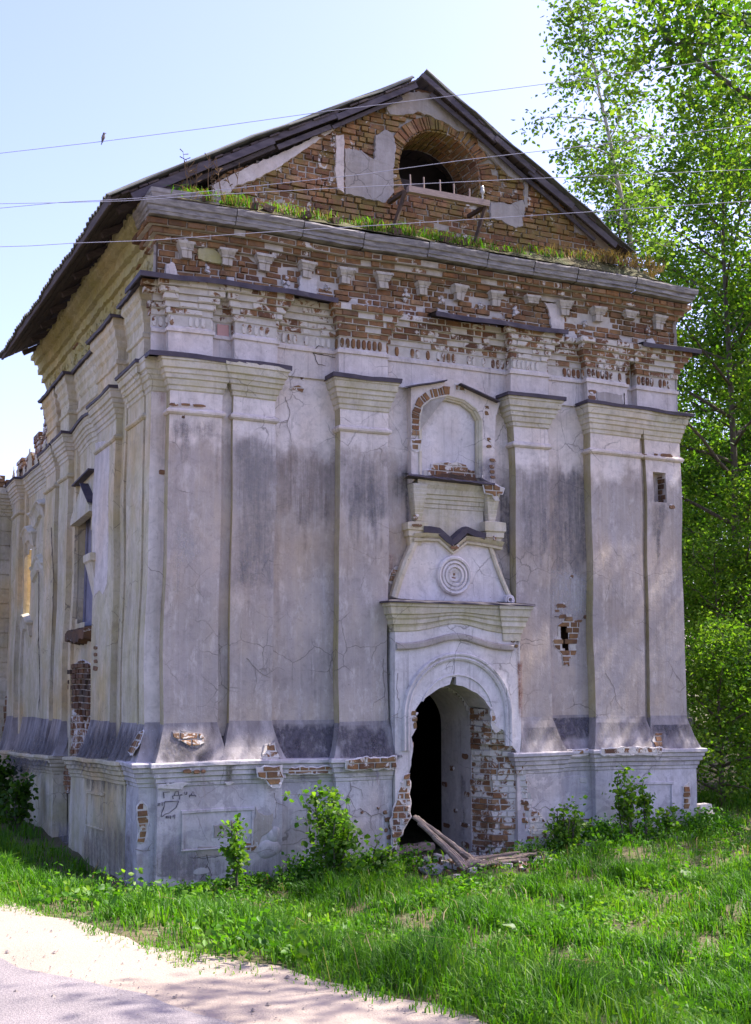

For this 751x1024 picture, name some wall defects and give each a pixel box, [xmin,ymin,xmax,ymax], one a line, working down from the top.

flaking render [210,128,396,203]
flaking render [385,91,528,229]
flaking render [298,276,318,302]
spalling [411,383,466,453]
spalling [551,602,586,666]
spalling [63,645,98,794]
spalling [171,729,206,749]
leakage [275,724,394,758]
spalling [490,708,500,733]
spalling [136,799,150,844]
spalling [256,742,412,850]